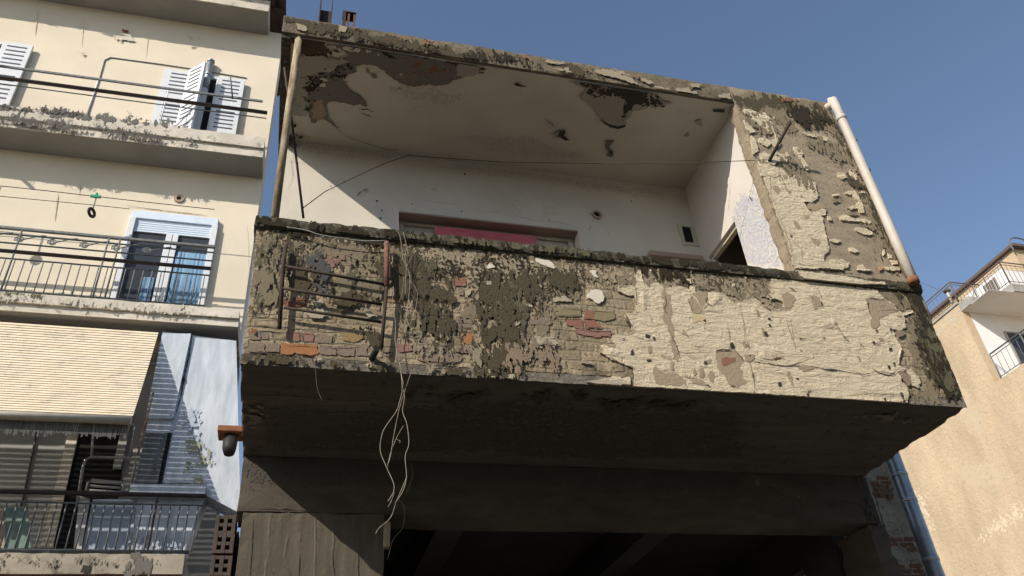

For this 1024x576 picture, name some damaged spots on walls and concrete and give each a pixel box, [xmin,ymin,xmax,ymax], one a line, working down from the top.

peeling [292,44,481,128]
water stain [0,103,203,145]
spalling [569,81,672,157]
peeling [773,174,826,237]
water stain [0,290,192,319]
flaking render [248,331,364,356]
water stain [242,215,792,379]
flaking render [528,307,630,338]
peeling [662,289,679,370]
peeling [690,290,708,322]
peeling [692,342,755,388]
crack [541,238,918,395]